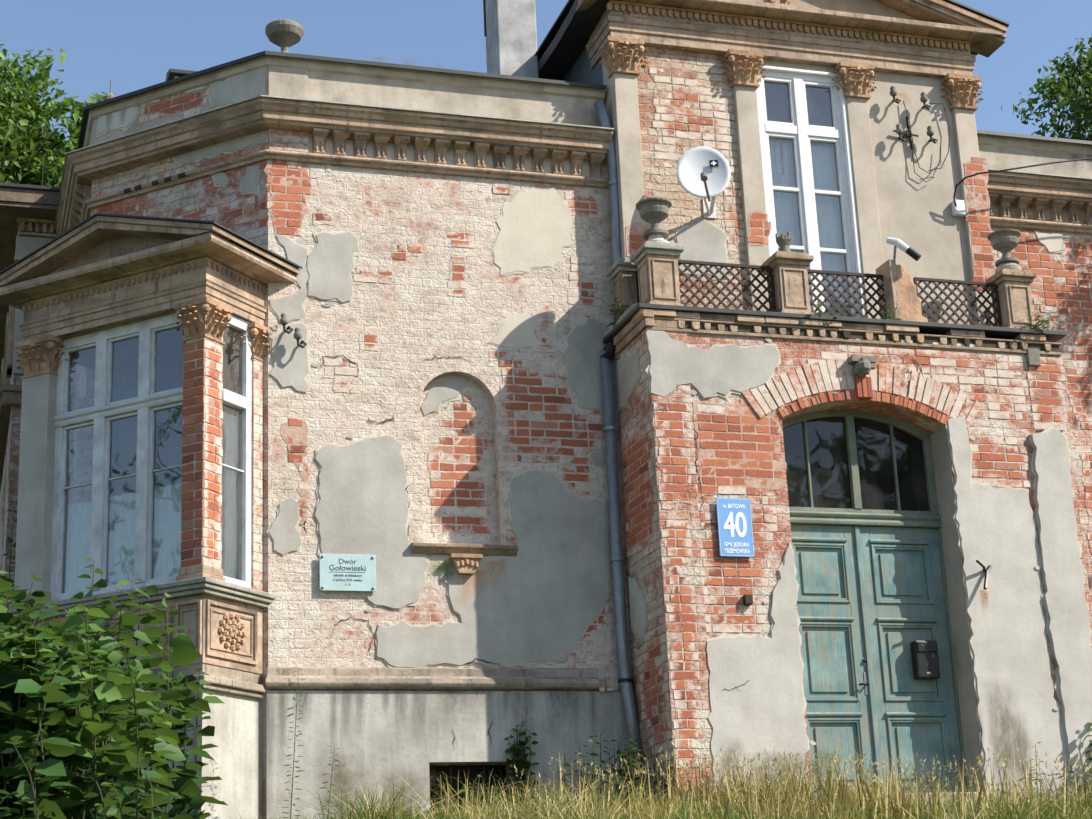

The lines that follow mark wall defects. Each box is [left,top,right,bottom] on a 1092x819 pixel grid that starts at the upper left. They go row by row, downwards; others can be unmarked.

flaking render [139,86,211,123]
flaking render [98,158,335,238]
flaking render [567,250,604,322]
flaking render [625,222,647,257]
flaking render [649,68,772,256]
flaking render [801,157,1092,488]
flaking render [428,382,493,537]
flaking render [489,324,604,499]
flaking render [621,386,787,769]
flaking render [1080,451,1092,555]